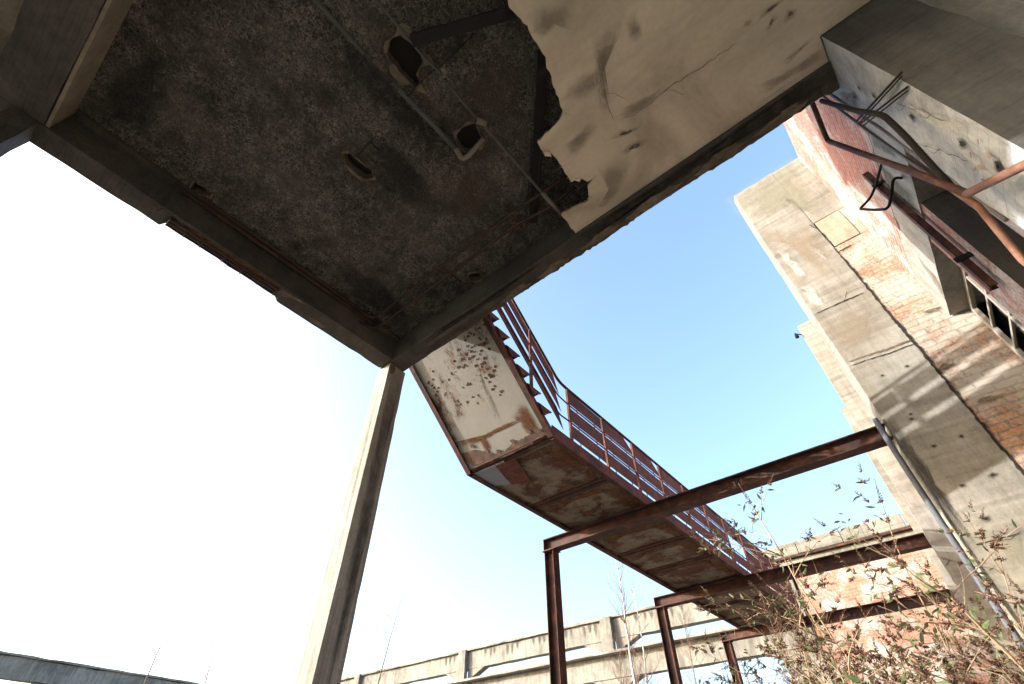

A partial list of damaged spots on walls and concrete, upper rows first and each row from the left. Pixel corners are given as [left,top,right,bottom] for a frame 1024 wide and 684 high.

spalling [384,23,435,94]
crack [598,43,736,120]
peeling [538,113,596,182]
spalling [580,100,808,250]
rust [426,323,503,406]
rust [461,408,546,466]